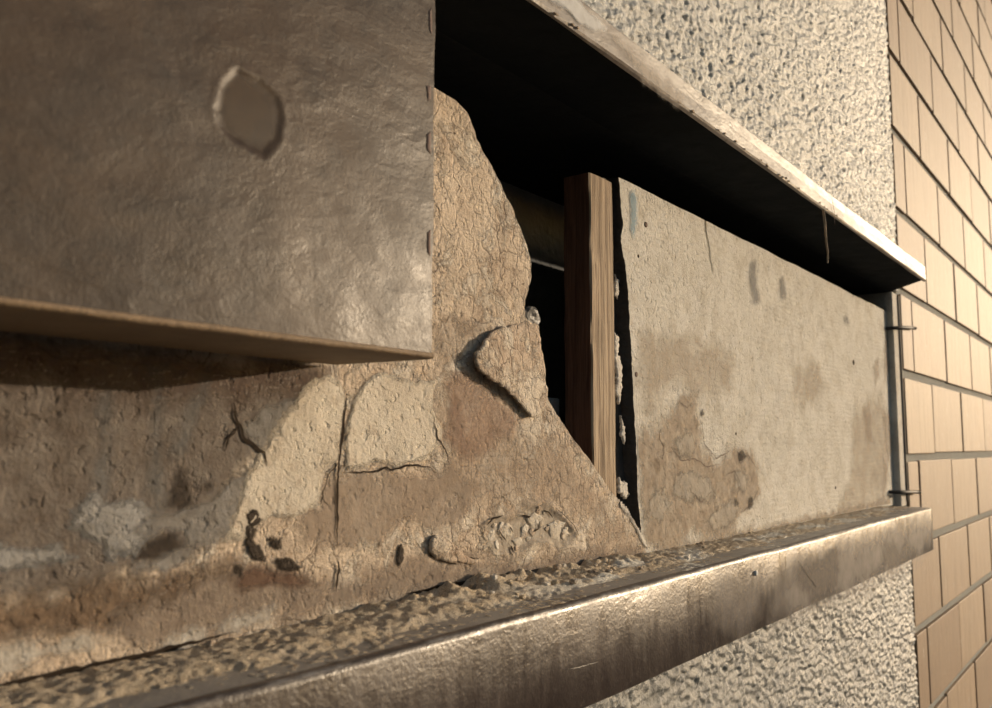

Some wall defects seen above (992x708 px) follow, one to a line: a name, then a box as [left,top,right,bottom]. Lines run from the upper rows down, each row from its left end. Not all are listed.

peeling [473,320,548,417]
peeling [614,332,625,445]
crack [225,403,267,464]
peeling [0,542,79,572]
peeling [68,372,442,571]
leakage [0,332,606,675]
crack [321,394,449,590]
peeling [428,535,481,565]
spalling [482,504,578,555]
peeling [617,477,648,548]
peeling [647,472,713,523]